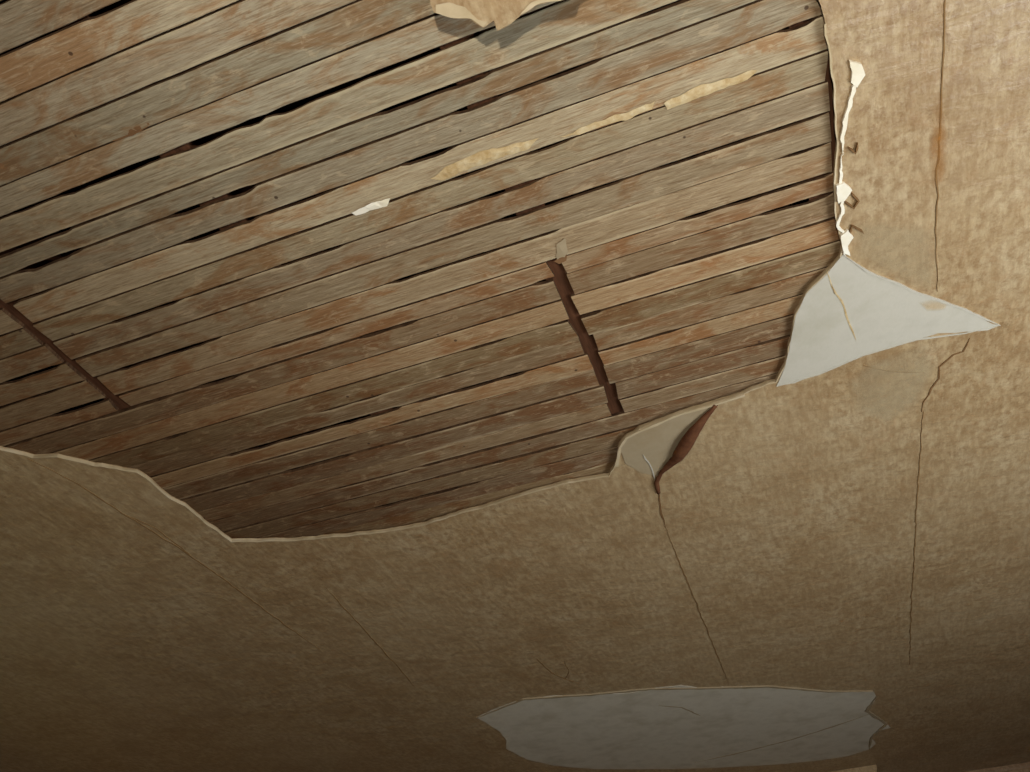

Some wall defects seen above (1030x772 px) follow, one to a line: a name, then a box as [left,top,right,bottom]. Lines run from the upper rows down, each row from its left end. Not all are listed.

spalling [0,0,1001,542]
crack [664,524,727,679]
peeling [476,685,890,769]